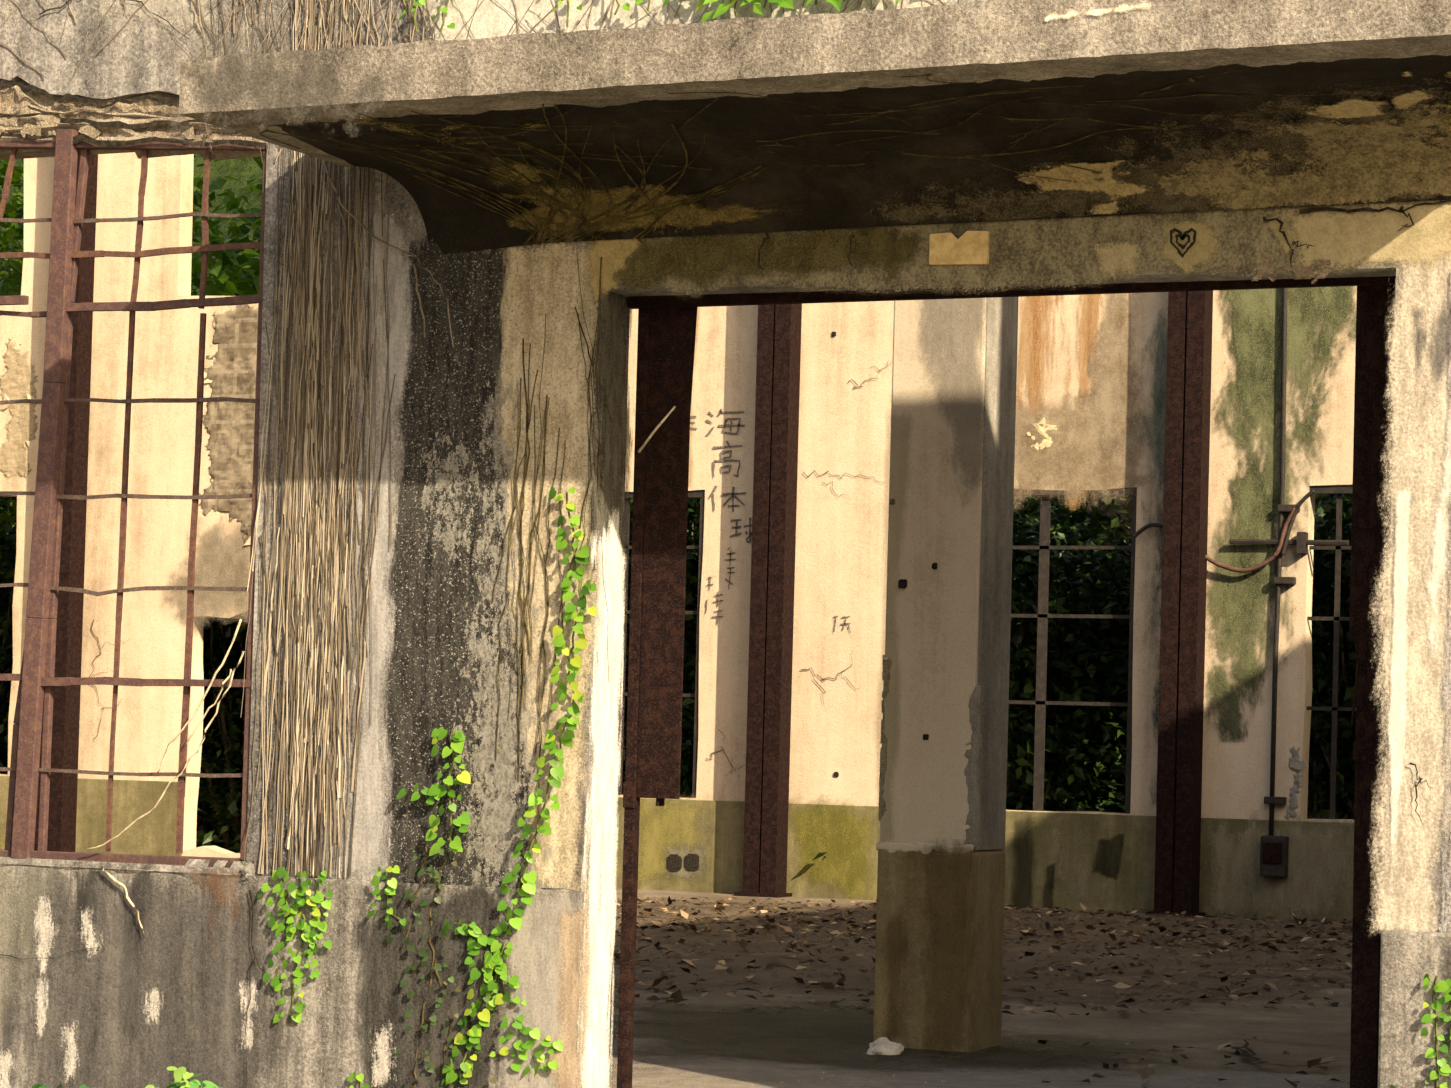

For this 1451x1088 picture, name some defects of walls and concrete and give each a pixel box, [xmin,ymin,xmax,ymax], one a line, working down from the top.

spalling [0,80,267,161]
crack [1263,200,1451,268]
water stain [1207,286,1356,742]
water stain [1415,272,1451,755]
water stain [338,201,587,1088]
water stain [1388,489,1411,855]
water stain [638,800,705,883]
water stain [793,801,871,900]
water stain [34,896,57,1036]
water stain [62,1022,78,1080]
water stain [239,981,258,1049]
water stain [610,844,1158,1069]